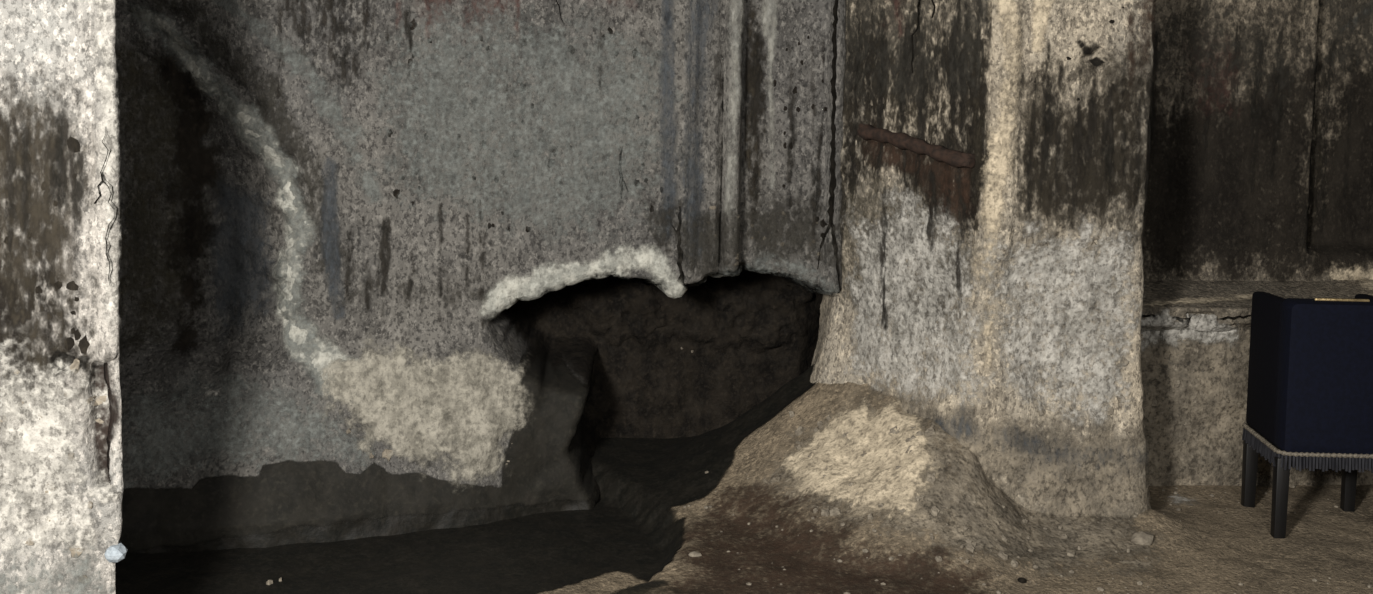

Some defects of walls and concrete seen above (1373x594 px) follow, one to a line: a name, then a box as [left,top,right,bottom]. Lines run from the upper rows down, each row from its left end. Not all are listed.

leakage [0,0,422,400]
leakage [439,213,485,327]
spalling [481,246,833,458]
spalling [782,191,979,520]
leakage [692,0,1336,335]
spalling [989,223,1312,487]
leakage [1330,267,1373,280]